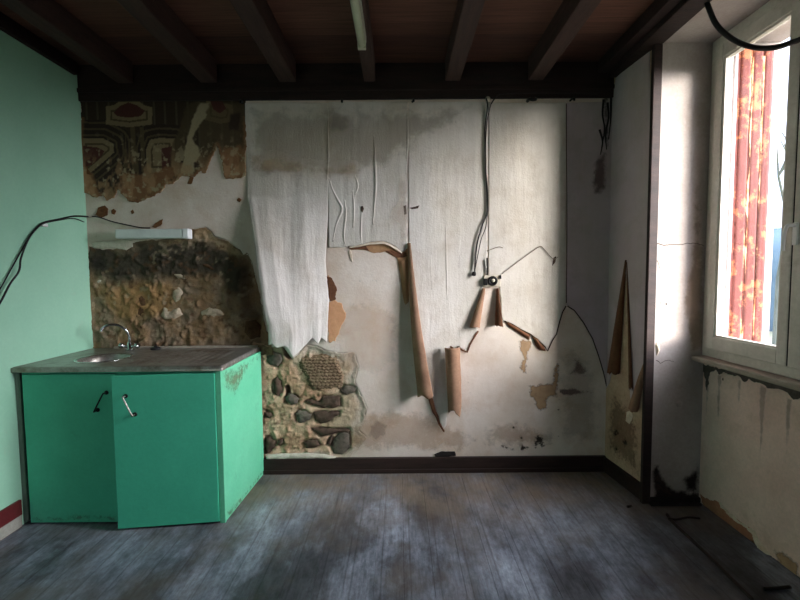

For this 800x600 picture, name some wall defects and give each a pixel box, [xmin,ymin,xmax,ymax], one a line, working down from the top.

spalling [88,227,367,459]
water stain [653,466,699,497]
peeling [700,494,771,556]